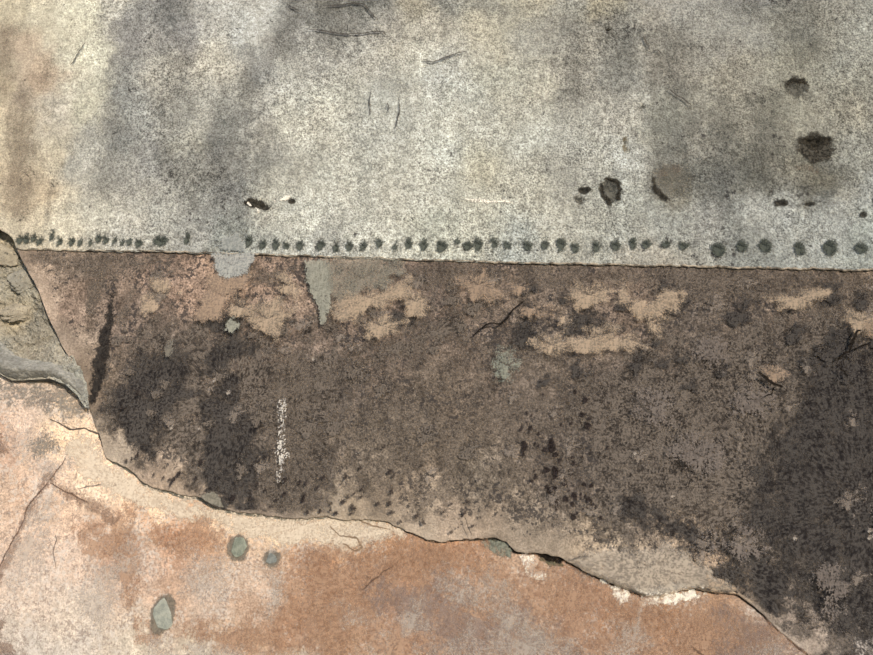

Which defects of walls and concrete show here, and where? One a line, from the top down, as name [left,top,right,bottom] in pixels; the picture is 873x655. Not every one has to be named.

spalling [782,75,810,98]
spalling [574,176,623,206]
spalling [0,230,89,409]
water stain [508,281,541,349]
water stain [0,265,495,515]
crack [0,459,101,566]
rust [71,502,146,607]
rust [148,518,232,556]
crack [50,419,473,551]
crack [563,554,640,597]
water stain [519,270,873,655]
crack [676,552,808,655]